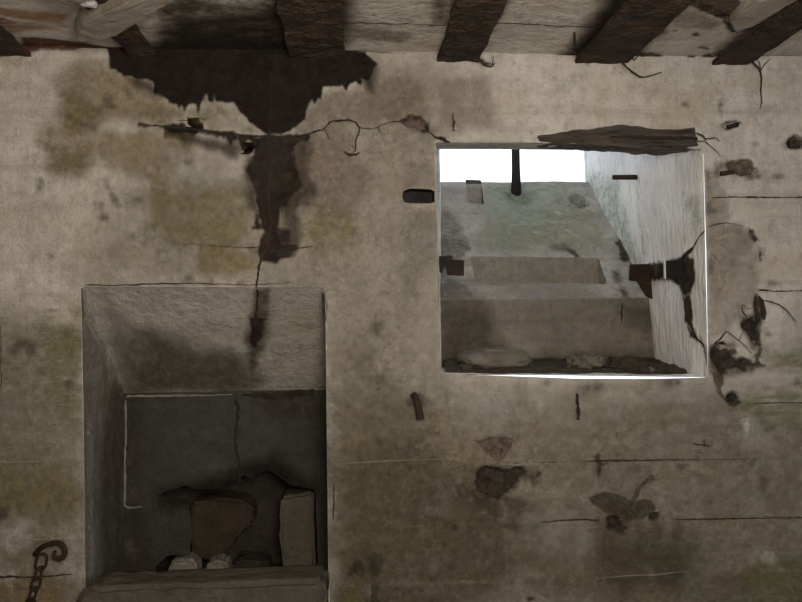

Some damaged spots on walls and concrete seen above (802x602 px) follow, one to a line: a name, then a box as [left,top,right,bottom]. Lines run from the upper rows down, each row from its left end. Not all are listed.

crack [86,74,401,327]
crack [428,113,455,143]
water stain [107,47,802,602]
spalling [649,254,767,400]
spalling [459,437,541,515]
peeling [590,476,692,581]